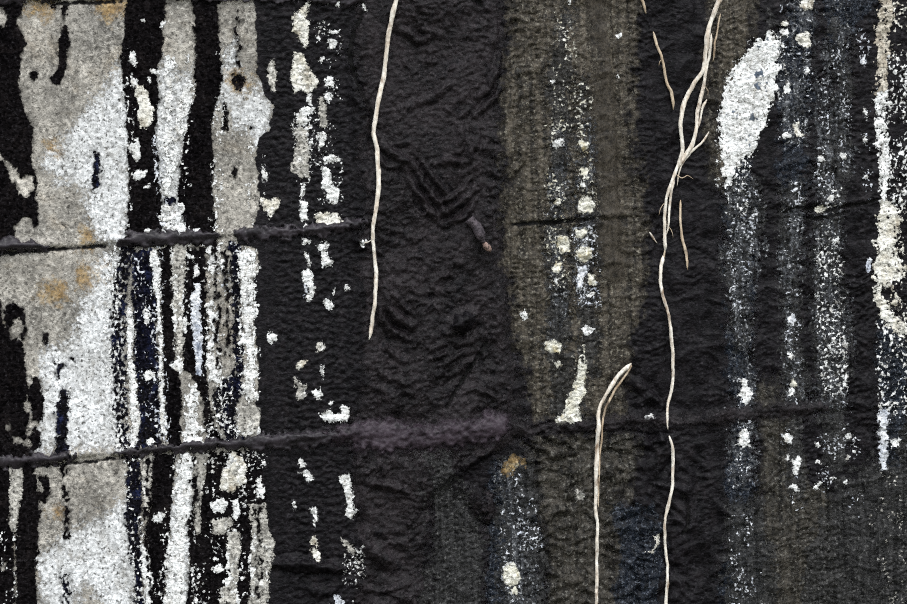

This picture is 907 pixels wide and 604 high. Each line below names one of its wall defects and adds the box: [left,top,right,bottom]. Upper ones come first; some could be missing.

peeling [799,0,815,10]
peeling [290,1,343,227]
peeling [715,5,852,408]
peeling [302,238,334,302]
peeling [323,284,350,310]
peeling [830,0,907,528]
peeling [735,419,752,476]
peeling [813,423,861,493]
peeling [729,514,762,604]